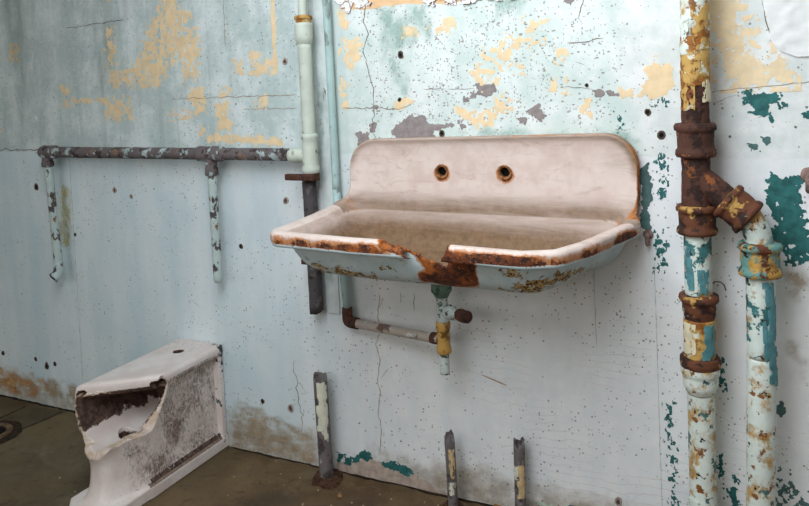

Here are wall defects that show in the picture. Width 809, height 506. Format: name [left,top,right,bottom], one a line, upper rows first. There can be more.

peeling [59,0,284,147]
crack [355,6,409,137]
peeling [391,14,573,138]
peeling [578,0,802,123]
peeling [764,171,809,267]
crack [0,395,76,430]
damp [234,408,313,463]
crack [233,447,319,468]
crack [375,295,389,454]
flaking render [337,449,455,496]
crack [341,471,493,506]
peeling [662,400,679,506]